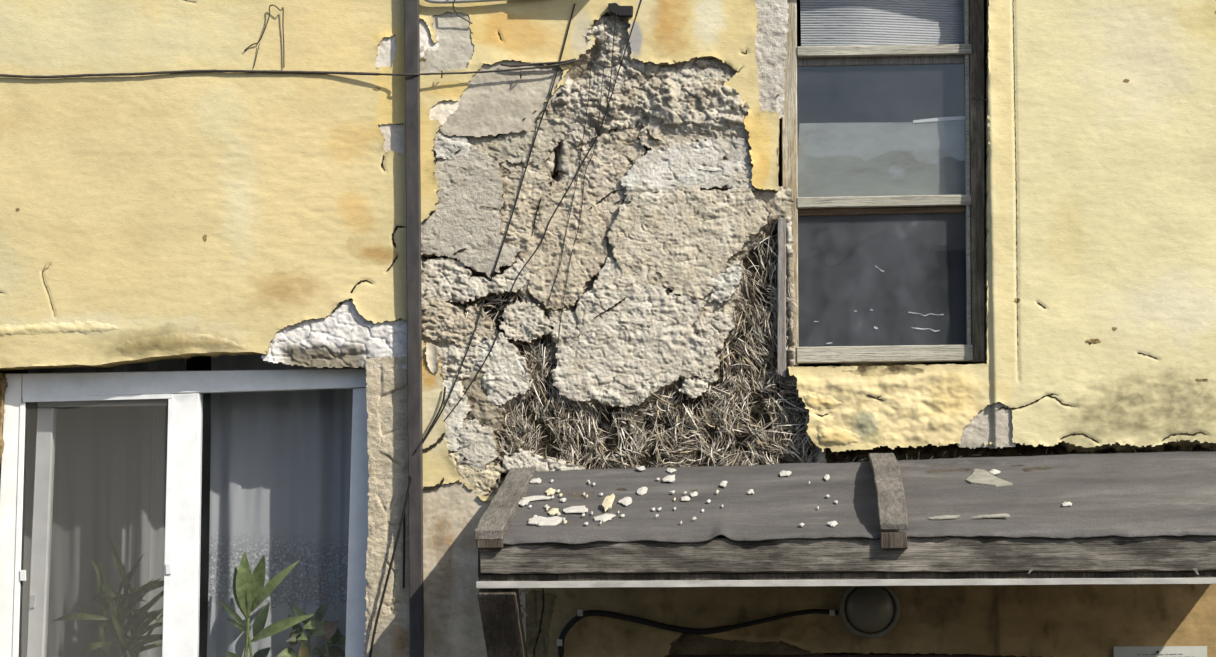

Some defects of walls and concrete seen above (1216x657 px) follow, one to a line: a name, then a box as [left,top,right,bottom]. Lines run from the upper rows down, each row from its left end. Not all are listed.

spalling [261,0,1216,657]
crack [995,393,1099,443]